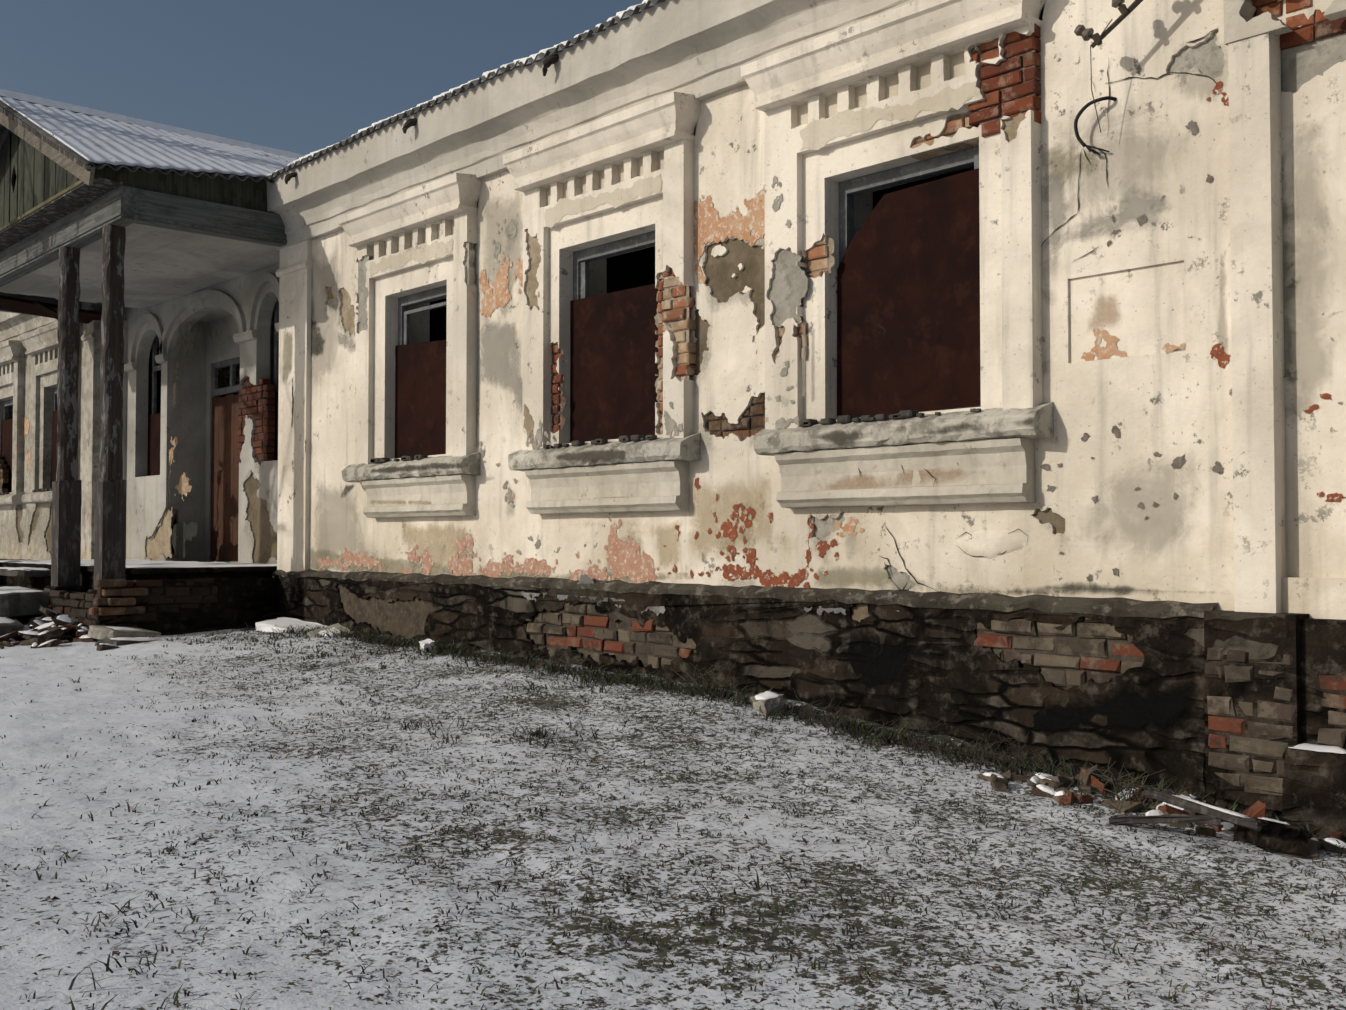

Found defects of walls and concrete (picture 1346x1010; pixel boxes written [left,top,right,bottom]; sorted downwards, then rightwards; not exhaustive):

spalling [911,23,1041,161]
flaking render [1251,0,1346,93]
peeling [465,214,542,317]
flaking render [654,176,834,441]
spalling [523,343,566,450]
flaking render [17,504,52,552]
spalling [237,377,277,564]
peeling [502,478,518,508]
flaking render [1033,508,1065,534]
peeling [1040,463,1063,492]
peeling [1153,452,1186,469]
spalling [316,493,869,669]